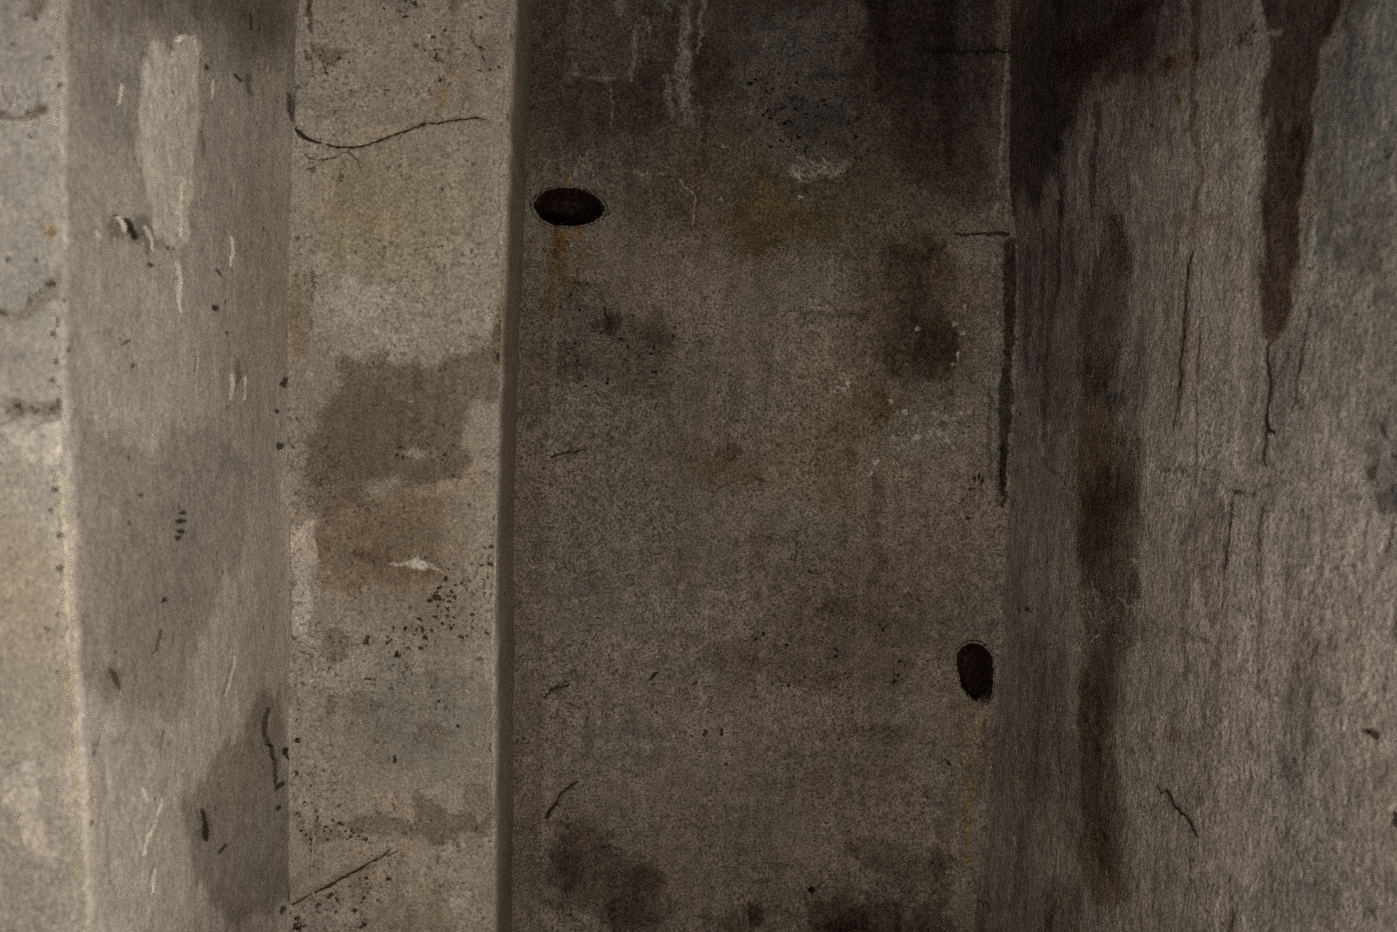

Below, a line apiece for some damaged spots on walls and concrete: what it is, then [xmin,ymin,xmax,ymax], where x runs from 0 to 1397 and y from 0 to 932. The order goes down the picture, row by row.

crack [294,117,487,149]
leakage [1256,0,1397,343]
leakage [950,303,967,366]
leakage [867,399,979,476]
crack [1263,343,1298,467]
efflorescence [391,556,444,573]
leakage [1071,576,1150,657]